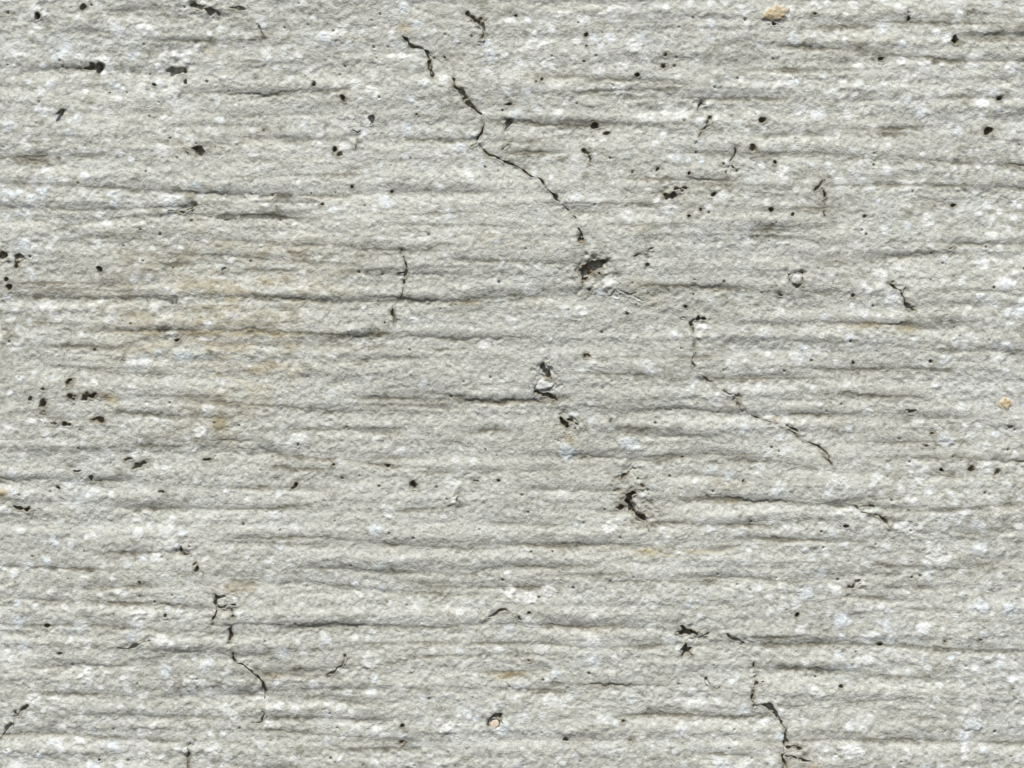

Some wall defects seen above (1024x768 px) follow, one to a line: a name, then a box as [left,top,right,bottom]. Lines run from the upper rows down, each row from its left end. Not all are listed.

crack [401,34,584,238]
crack [581,148,592,165]
crack [617,287,836,469]
crack [210,592,268,729]
crack [696,631,813,768]